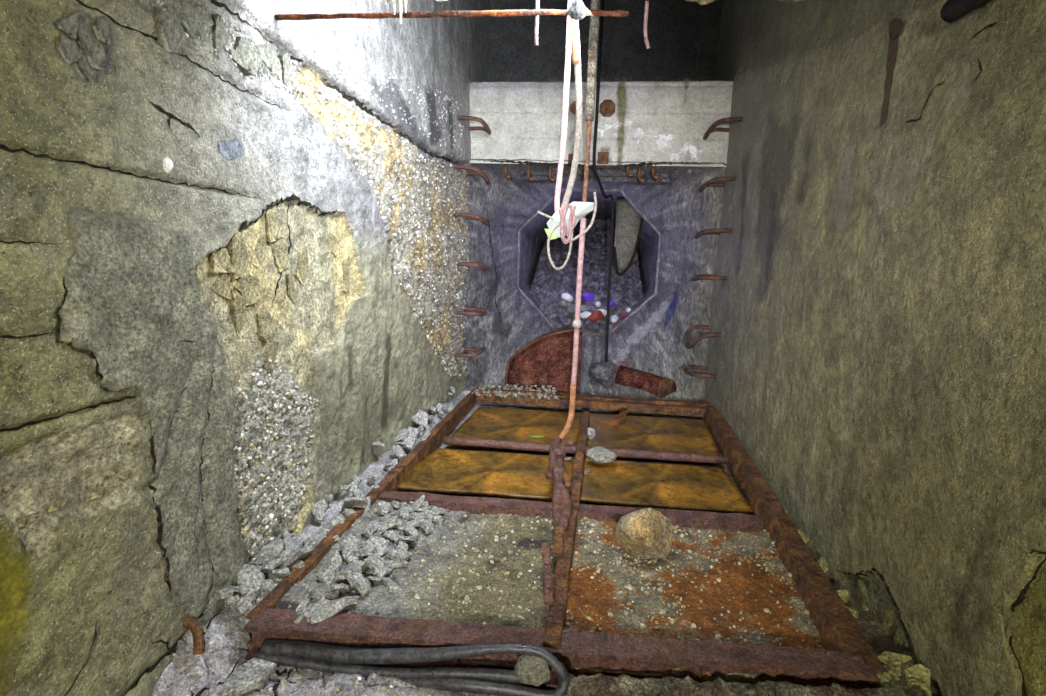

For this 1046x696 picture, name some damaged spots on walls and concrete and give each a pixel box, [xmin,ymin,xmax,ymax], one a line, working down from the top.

spalling [275,9,568,21]
rust [880,19,905,127]
crack [0,144,257,198]
crack [0,238,69,246]
crack [0,331,55,339]
crack [0,340,222,696]
damp [0,534,30,696]
crack [189,633,252,696]
crack [272,665,291,696]